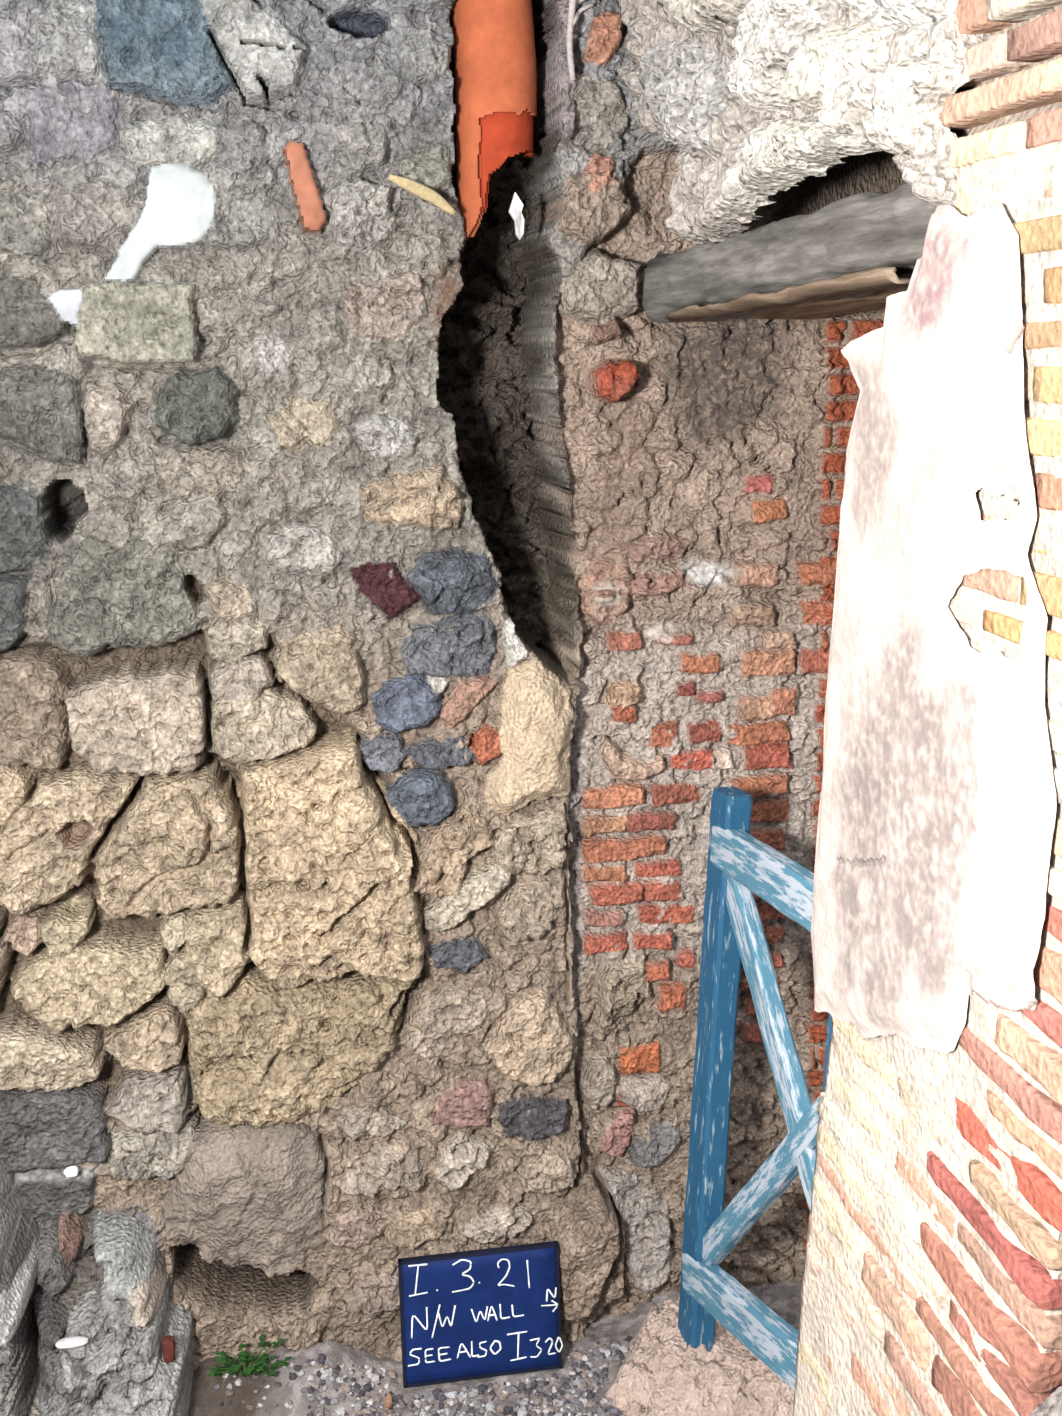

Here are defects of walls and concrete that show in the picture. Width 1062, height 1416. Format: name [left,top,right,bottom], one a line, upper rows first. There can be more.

crack [242,38,306,50]
flaking render [811,203,1057,1053]